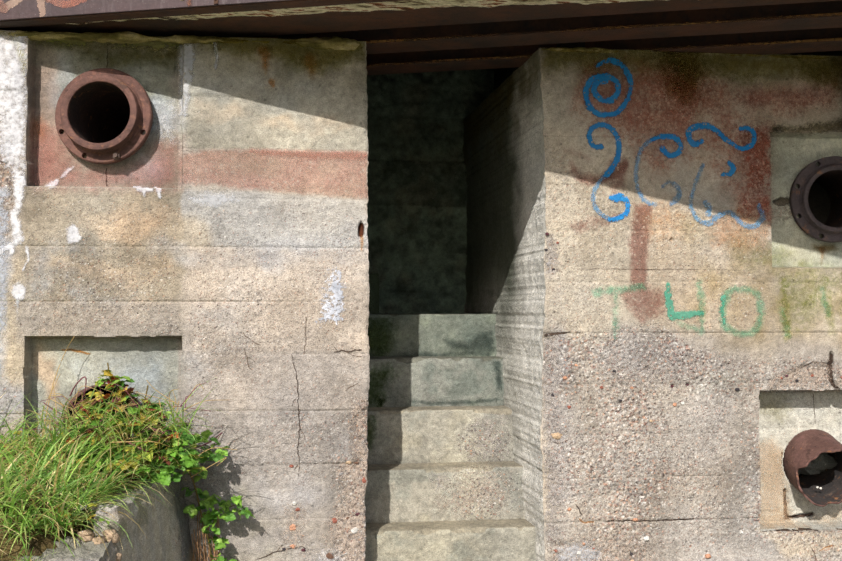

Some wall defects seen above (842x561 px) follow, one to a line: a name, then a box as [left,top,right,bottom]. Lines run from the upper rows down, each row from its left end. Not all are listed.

water stain [0,31,29,304]
crack [291,318,307,476]
crack [795,353,840,389]
crack [762,488,842,559]